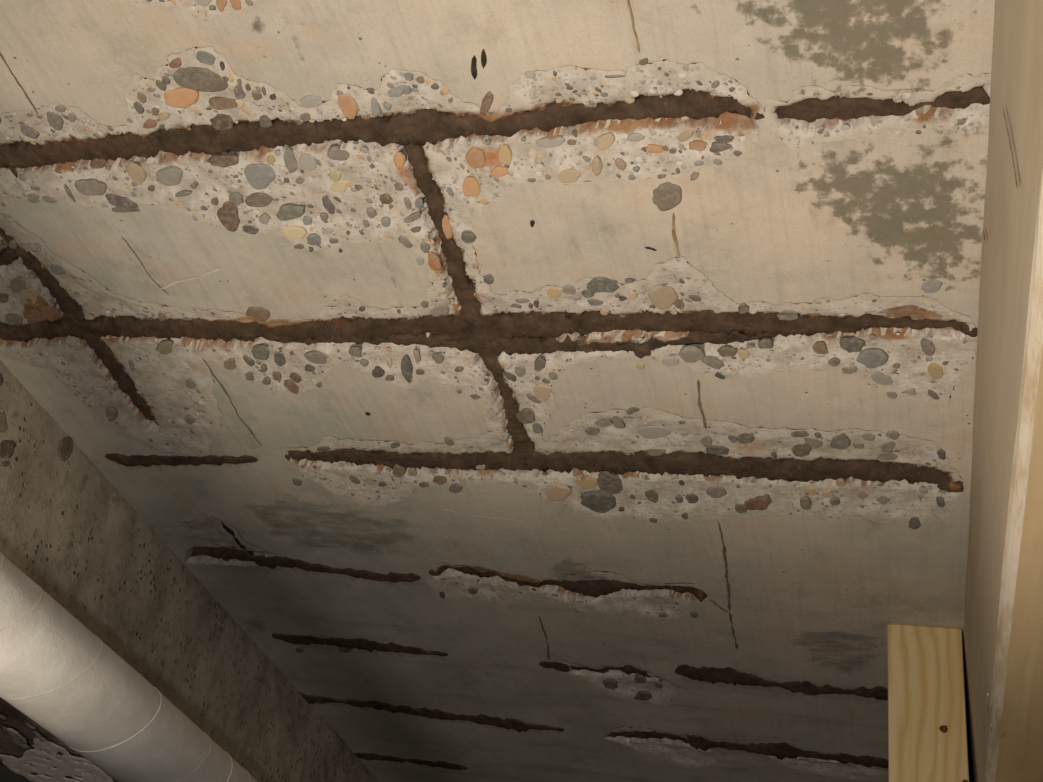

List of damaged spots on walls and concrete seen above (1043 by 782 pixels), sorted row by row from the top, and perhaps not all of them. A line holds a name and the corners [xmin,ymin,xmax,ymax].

spalling [129,0,258,21]
crack [627,0,639,52]
water stain [737,0,950,95]
water stain [795,132,985,289]
spalling [0,47,991,529]
rust [887,307,940,318]
spalling [178,513,707,620]
spalling [272,633,448,657]
spalling [539,661,888,706]
spalling [299,692,565,733]
peeling [0,715,113,782]
spalling [354,753,468,770]